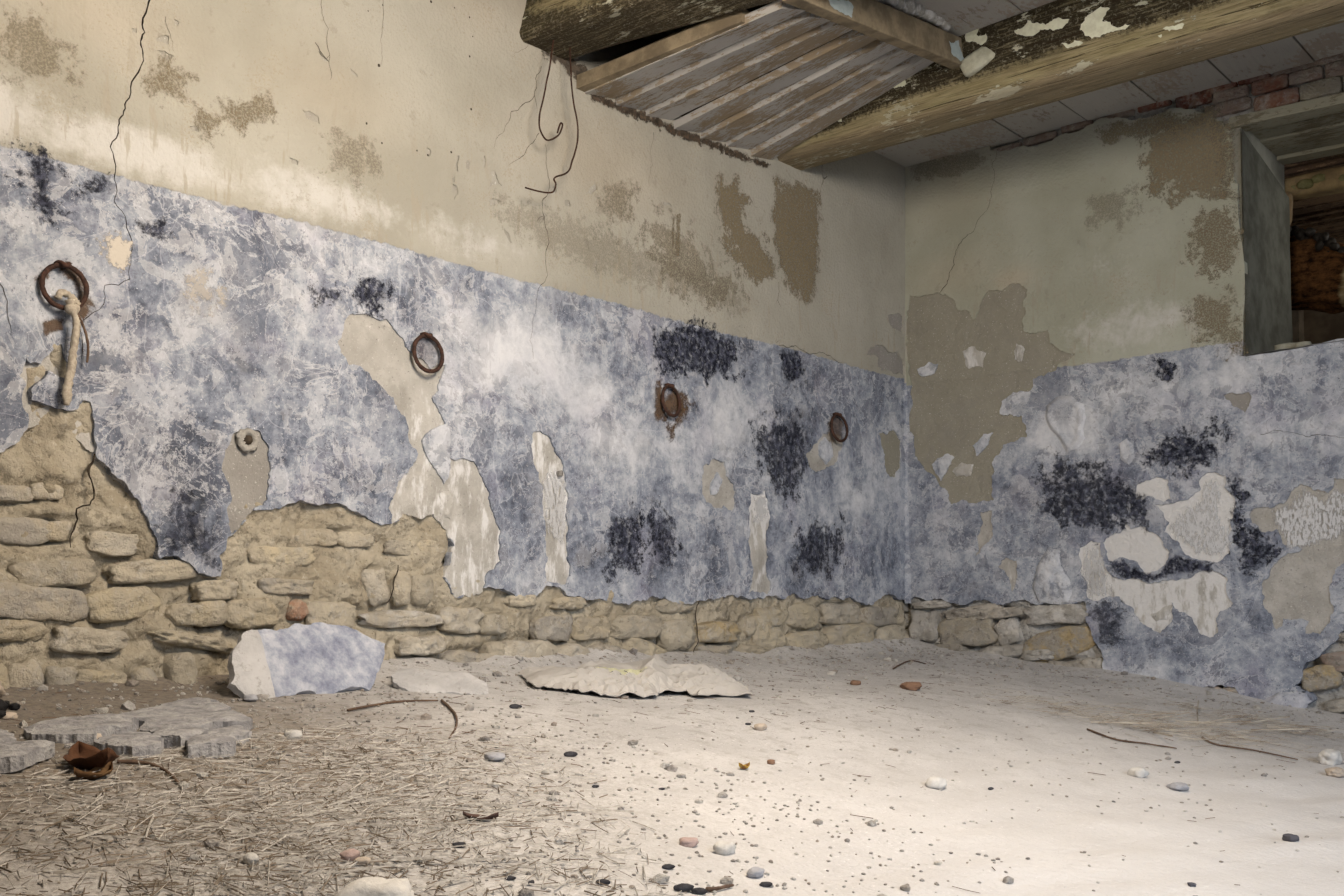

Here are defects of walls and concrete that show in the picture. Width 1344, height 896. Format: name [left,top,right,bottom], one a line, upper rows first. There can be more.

peeling [1014,7,1129,48]
spalling [993,53,1344,151]
crack [80,0,173,356]
rust [43,319,64,336]
rust [35,261,95,323]
leakage [652,315,753,386]
rust [654,380,696,439]
spalling [0,283,1236,689]
leakage [594,501,684,596]
leakage [741,408,849,595]
leakage [1031,411,1344,648]
spalling [1250,478,1344,714]